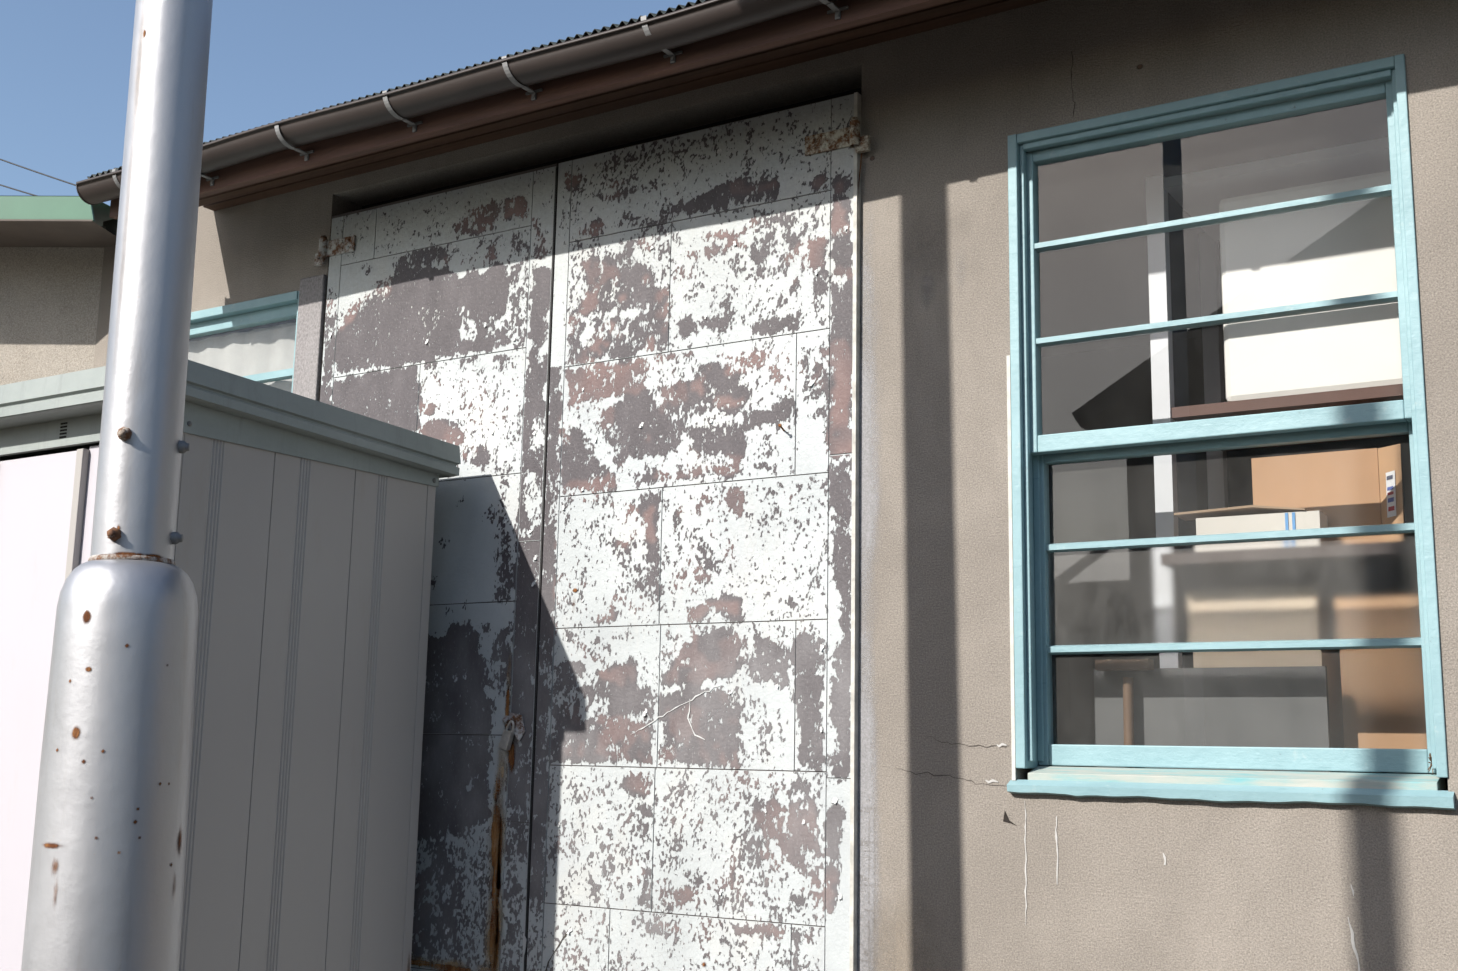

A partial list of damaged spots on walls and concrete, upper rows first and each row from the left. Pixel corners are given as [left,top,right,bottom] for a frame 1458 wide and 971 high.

peeling [320,99,853,971]
corrosion [408,688,515,971]
crack [902,739,1007,786]